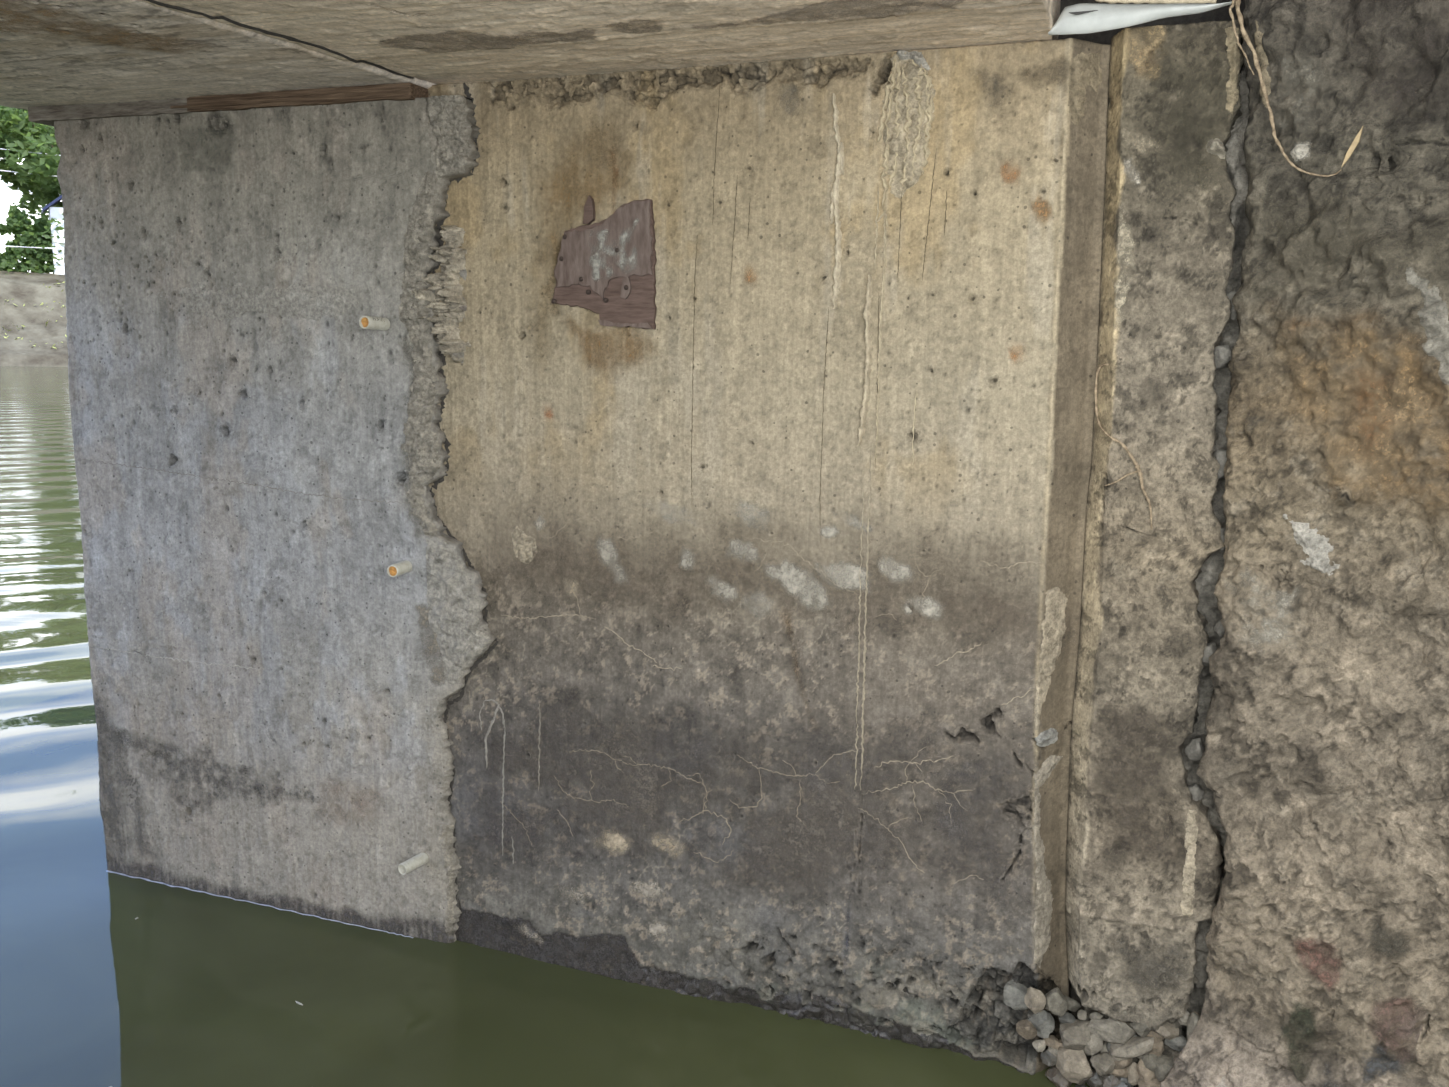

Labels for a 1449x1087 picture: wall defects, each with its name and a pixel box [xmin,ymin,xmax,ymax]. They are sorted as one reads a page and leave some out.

crack [145,0,414,79]
spalling [478,50,921,133]
spalling [499,174,510,214]
spalling [375,95,473,545]
damp [473,50,935,891]
crack [1136,48,1250,1038]
spalling [438,824,456,933]
crack [500,746,1030,900]
spalling [721,587,1100,1075]
flaking render [1283,1003,1315,1082]
flaking render [1363,998,1425,1081]